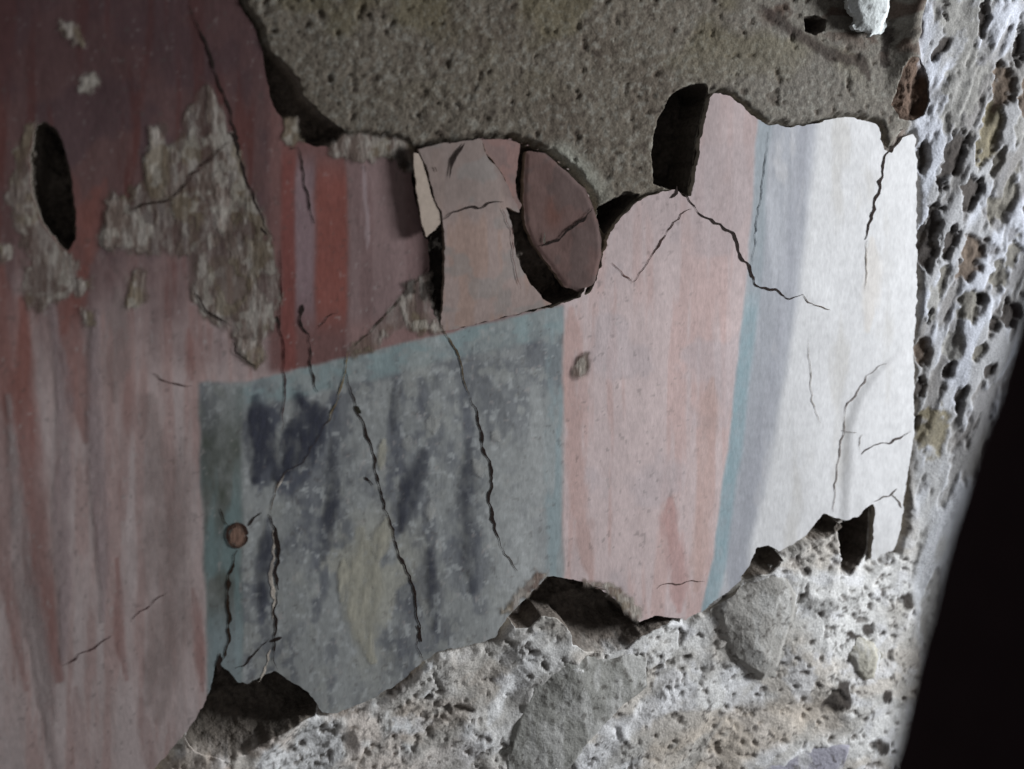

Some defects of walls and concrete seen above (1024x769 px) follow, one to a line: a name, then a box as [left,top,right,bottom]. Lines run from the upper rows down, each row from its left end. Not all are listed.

peeling [0,122,96,327]
peeling [100,85,283,370]
spalling [262,47,441,237]
spalling [651,84,707,195]
crack [612,137,830,310]
crack [865,125,904,286]
spalling [882,57,929,151]
crack [129,3,427,680]
crack [440,319,518,571]
crack [808,340,911,507]
spalling [834,507,868,576]
crack [62,636,111,666]